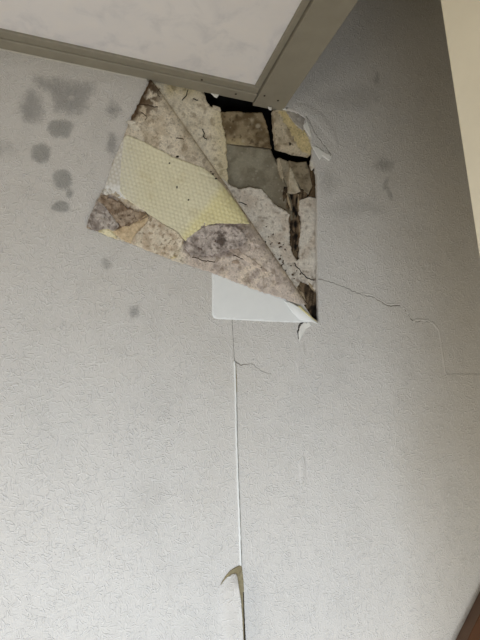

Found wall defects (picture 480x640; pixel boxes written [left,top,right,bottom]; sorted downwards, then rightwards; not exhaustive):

peeling [86,80,317,320]
crack [318,279,446,374]